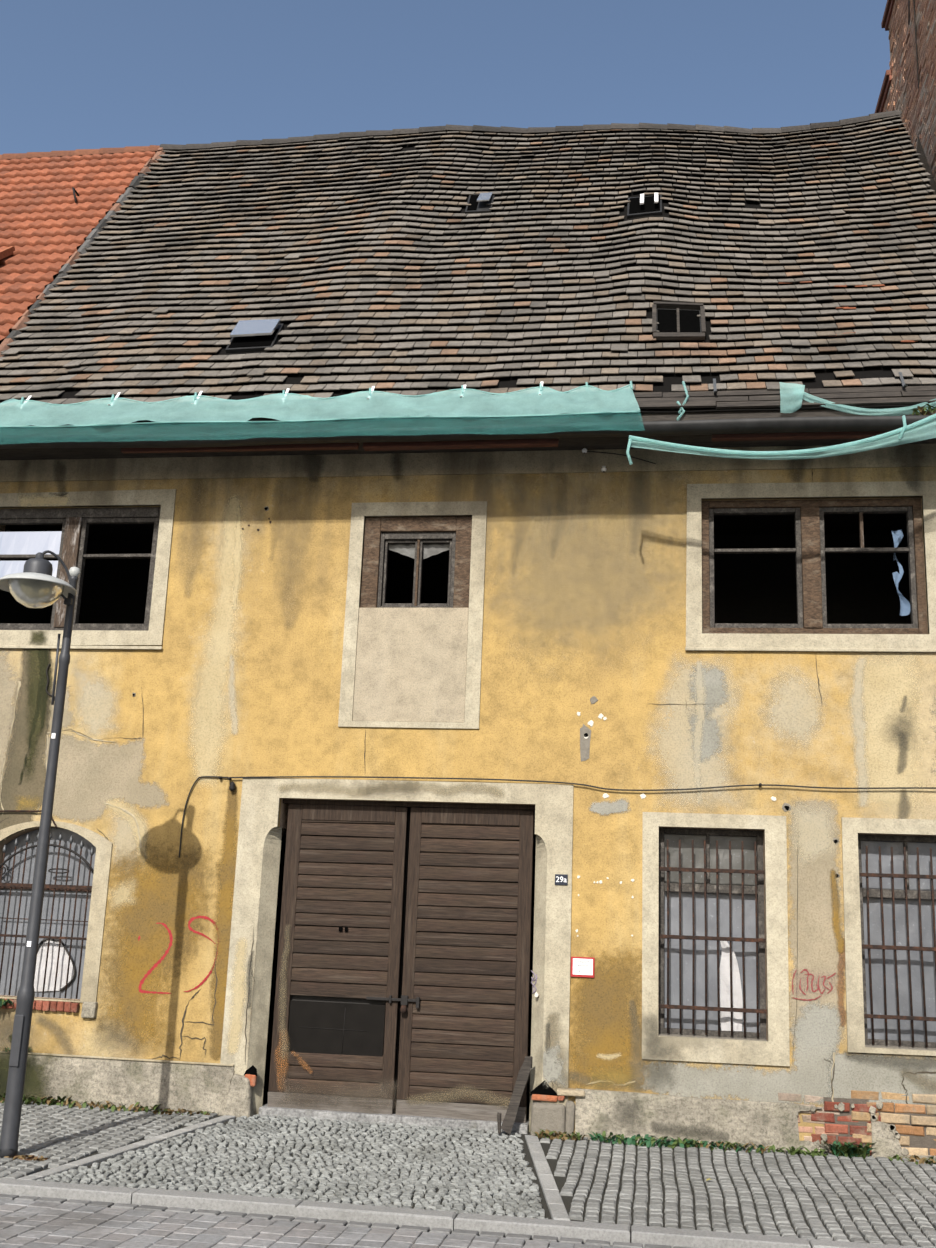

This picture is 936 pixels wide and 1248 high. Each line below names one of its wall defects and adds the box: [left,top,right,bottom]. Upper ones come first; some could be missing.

water stain [0,649,51,840]
peeling [37,674,169,868]
peeling [657,662,733,802]
peeling [851,659,912,806]
crack [153,950,218,1060]
crack [230,927,255,1084]
crack [901,1071,936,1104]